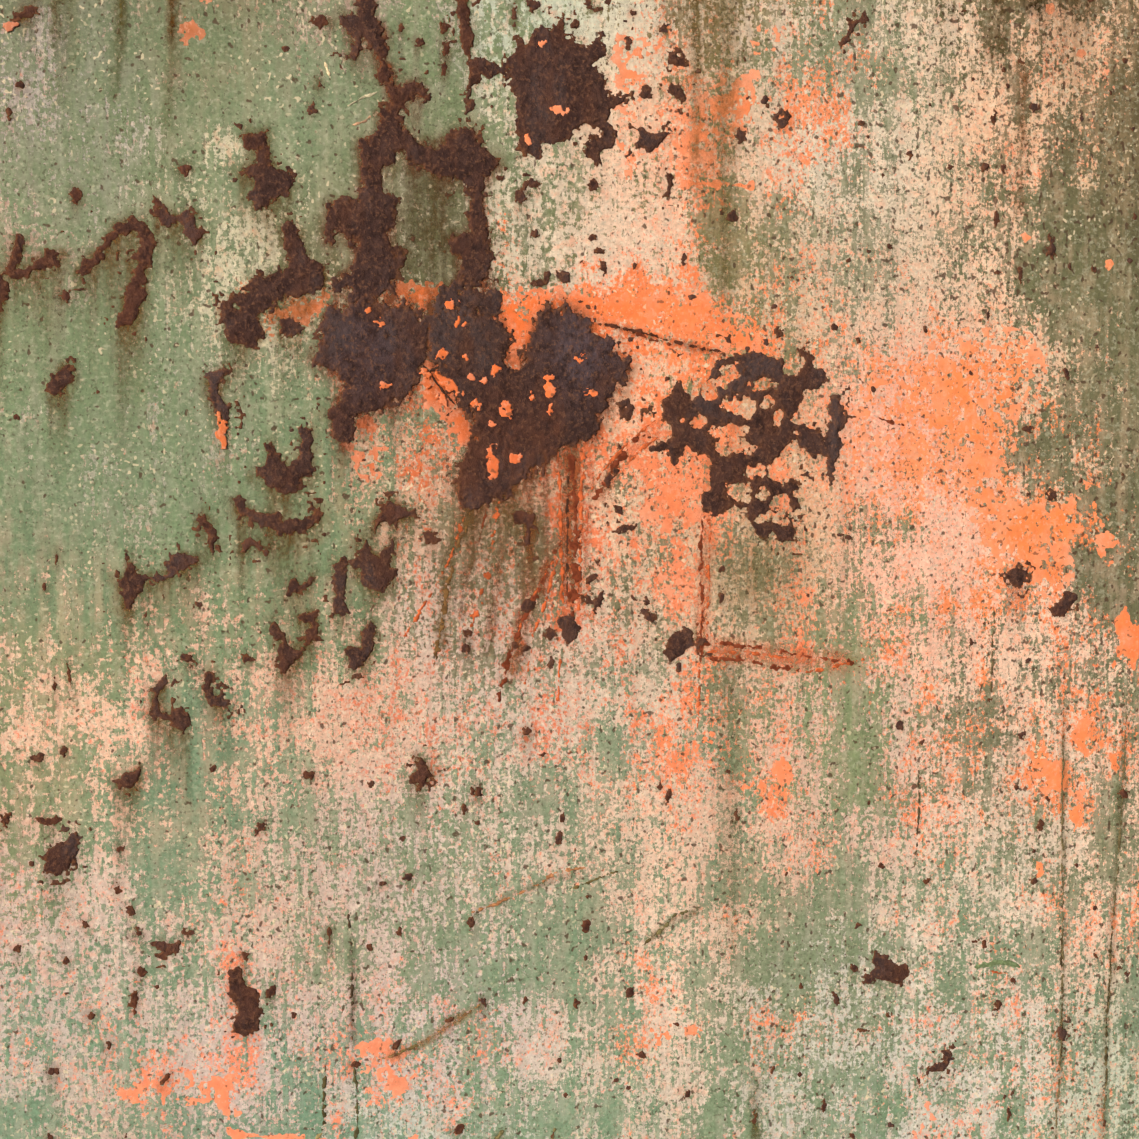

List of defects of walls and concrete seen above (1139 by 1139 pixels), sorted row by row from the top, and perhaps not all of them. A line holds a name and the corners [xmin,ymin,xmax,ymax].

corrosion [68,187,93,213]
corrosion [0,195,217,351]
corrosion [102,0,856,685]
peeling [852,322,1119,603]
peeling [1111,606,1139,670]
corrosion [140,653,245,744]
peeling [1026,746,1089,832]
peeling [1071,715,1092,758]
peeling [1110,754,1120,771]
corrosion [217,952,276,1038]
corrosion [850,945,910,987]
peeling [109,1067,305,1139]